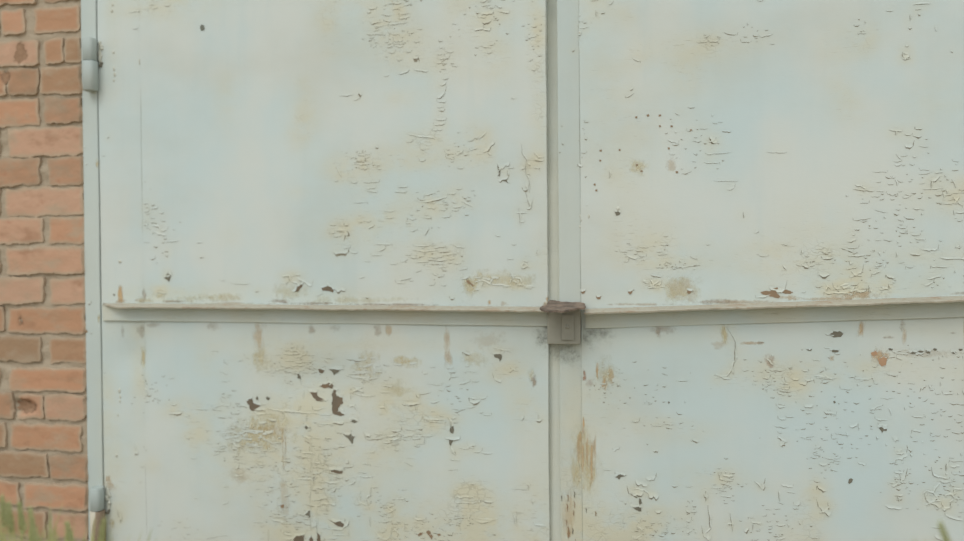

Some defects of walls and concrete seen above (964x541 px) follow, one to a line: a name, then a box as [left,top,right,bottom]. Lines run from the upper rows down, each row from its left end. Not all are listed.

peeling [362,0,515,162]
peeling [281,273,346,300]
peeling [394,185,476,286]
peeling [796,128,964,288]
peeling [742,328,964,516]